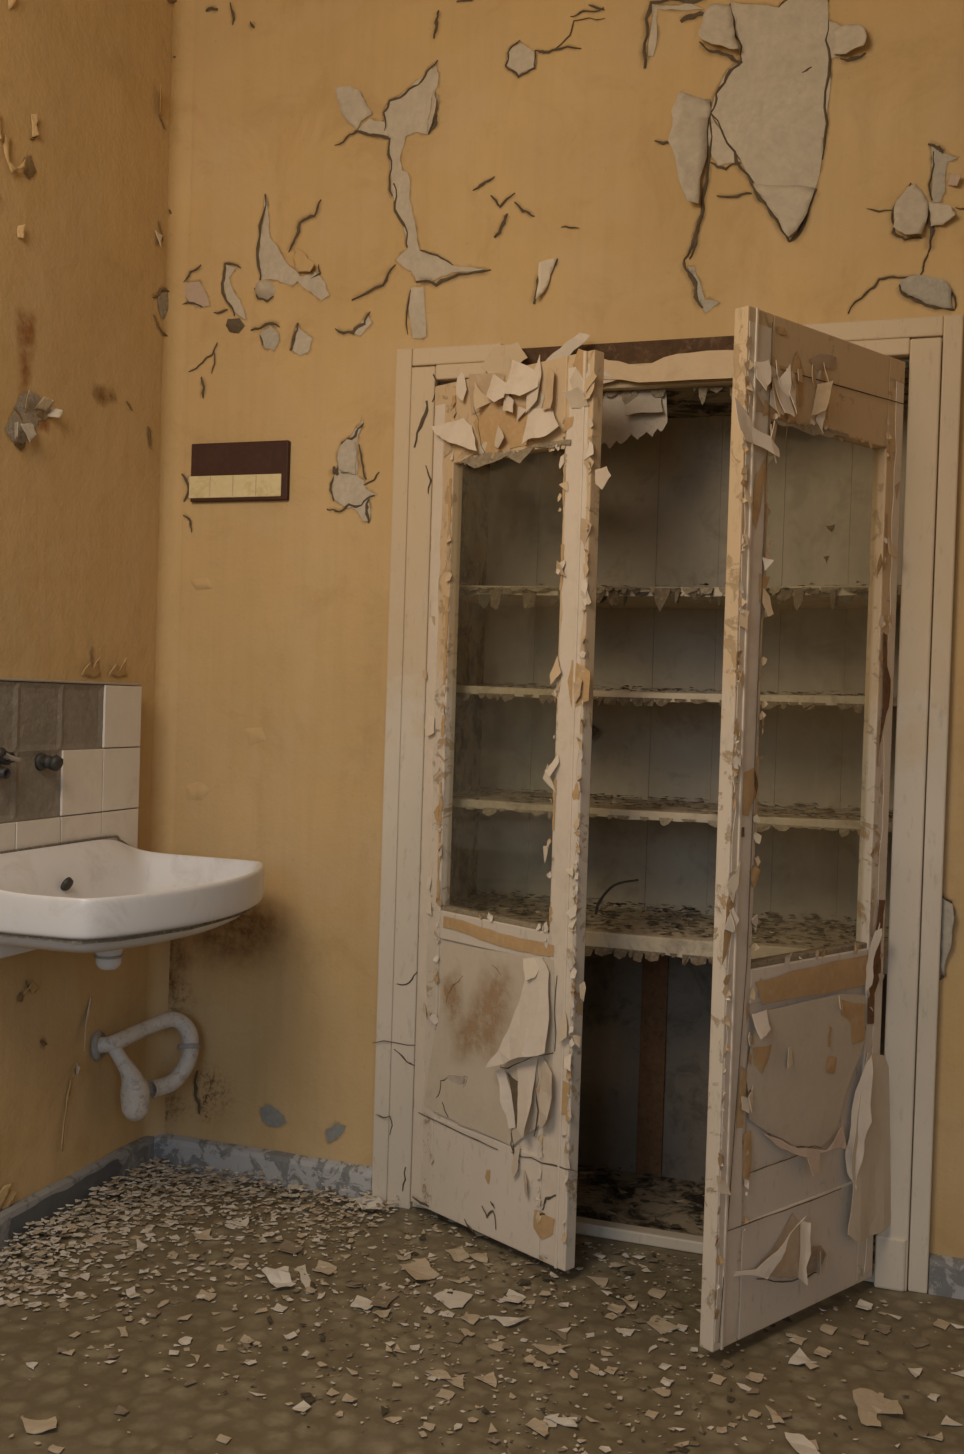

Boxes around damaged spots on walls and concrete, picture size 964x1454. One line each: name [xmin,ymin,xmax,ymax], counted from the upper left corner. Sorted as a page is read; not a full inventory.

peeling [505,7,605,78]
peeling [153,194,329,355]
peeling [335,60,491,339]
peeling [642,0,867,313]
peeling [847,143,964,314]
peeling [6,390,63,450]
peeling [327,418,379,523]